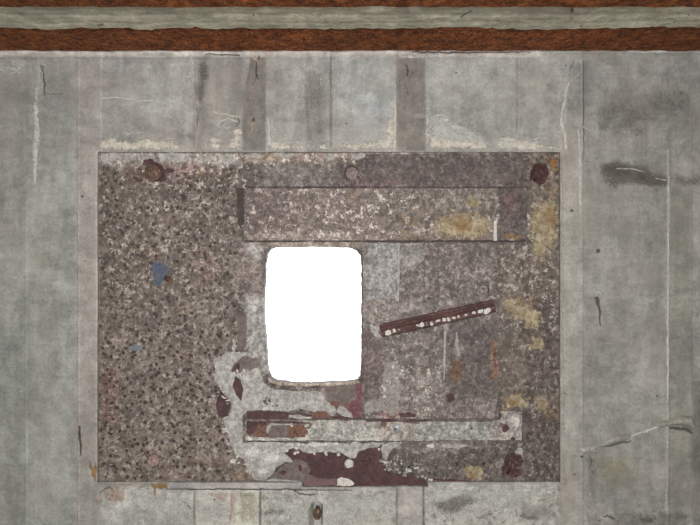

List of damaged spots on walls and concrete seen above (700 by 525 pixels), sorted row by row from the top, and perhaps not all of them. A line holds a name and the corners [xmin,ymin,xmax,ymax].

efflorescence [32,60,47,185]
peeling [211,316,523,487]
damp [603,162,670,519]